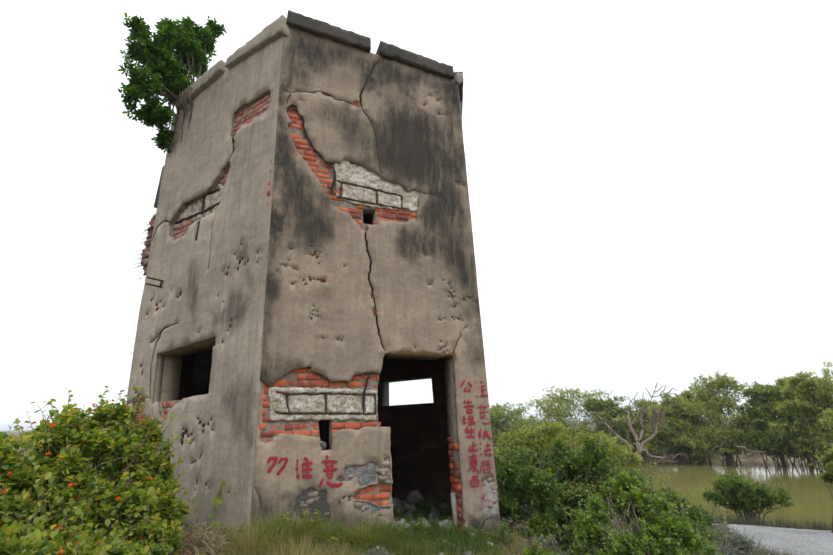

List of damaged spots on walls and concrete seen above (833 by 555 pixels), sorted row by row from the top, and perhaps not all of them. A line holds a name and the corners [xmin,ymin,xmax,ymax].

flaking render [173,168,230,240]
flaking render [233,92,276,136]
leakage [270,136,333,247]
crack [285,61,381,173]
flaking render [286,99,420,232]
leakage [280,32,428,104]
leakage [377,83,480,313]
leakage [265,274,275,316]
crack [365,232,386,352]
flaking render [259,367,381,450]
flaking render [336,457,392,516]
flaking render [447,437,477,539]